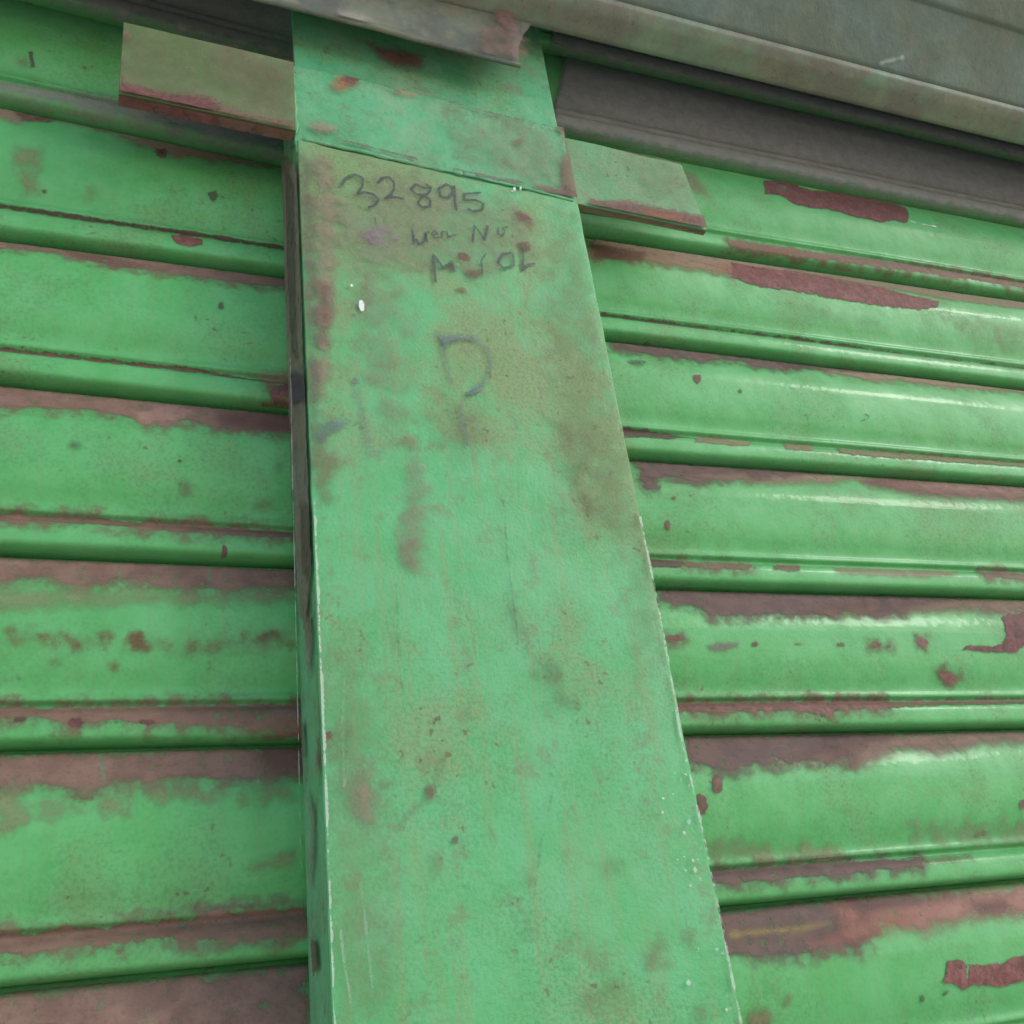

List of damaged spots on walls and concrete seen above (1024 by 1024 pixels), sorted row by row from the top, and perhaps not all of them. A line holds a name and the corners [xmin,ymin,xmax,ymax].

peeling [764,180,936,227]
peeling [172,234,202,247]
peeling [731,262,1024,310]
peeling [963,612,1024,653]
peeling [943,956,1024,995]